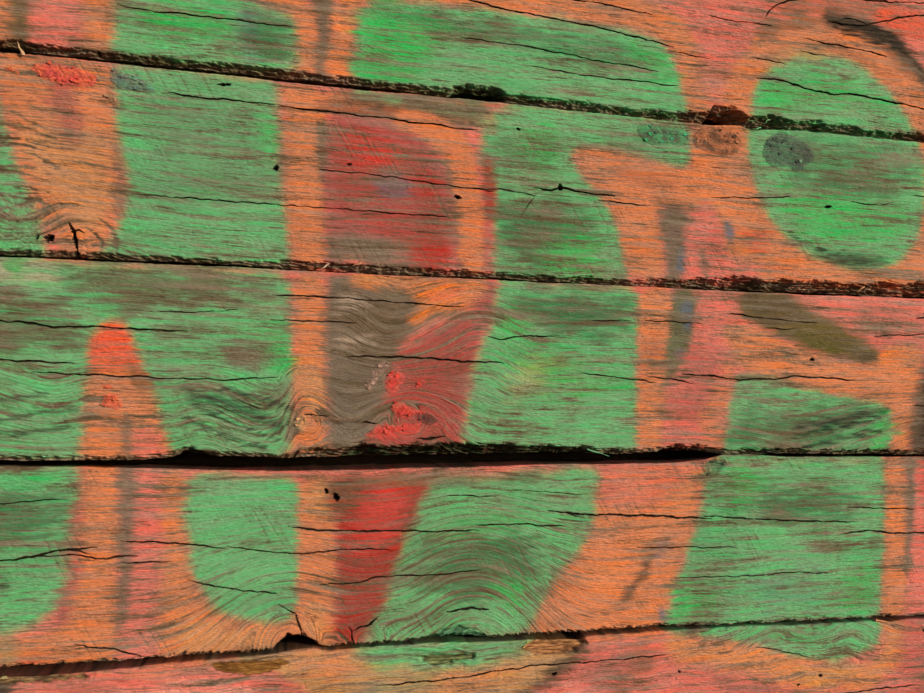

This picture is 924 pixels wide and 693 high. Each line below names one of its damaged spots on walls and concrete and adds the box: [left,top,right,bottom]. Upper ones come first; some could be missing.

crack [709,0,796,26]
crack [469,0,709,59]
crack [0,490,924,564]
crack [320,570,477,585]
crack [679,570,832,578]
crack [190,580,302,635]
crack [446,605,489,613]